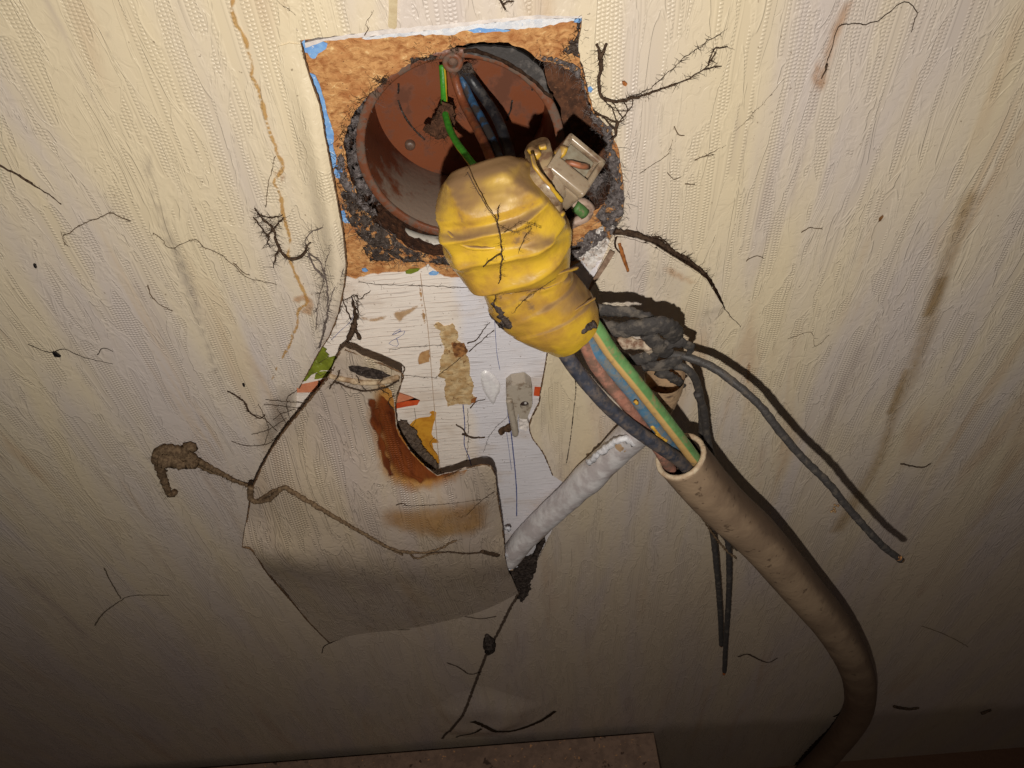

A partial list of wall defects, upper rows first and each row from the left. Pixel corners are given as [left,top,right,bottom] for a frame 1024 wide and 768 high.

damp [231,0,249,54]
peeling [302,40,328,59]
peeling [309,72,343,178]
damp [250,70,309,369]
peeling [434,322,477,406]
corrosion [368,386,467,487]
peeling [242,347,518,643]
crack [441,591,557,739]